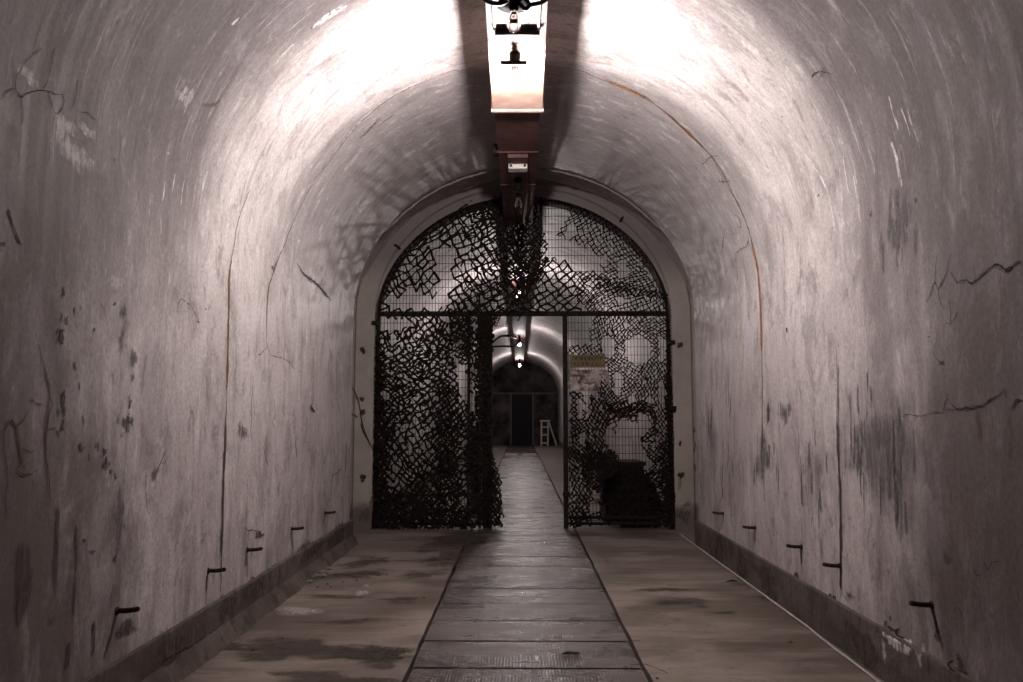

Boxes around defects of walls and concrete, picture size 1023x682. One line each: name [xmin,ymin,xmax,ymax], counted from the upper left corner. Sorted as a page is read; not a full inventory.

crack [2,48,96,165]
corrosion [546,66,718,167]
crack [258,68,473,370]
corrosion [718,179,769,361]
crack [926,255,1022,325]
crack [1,346,59,519]
leakage [845,372,915,536]
crack [905,390,1021,438]